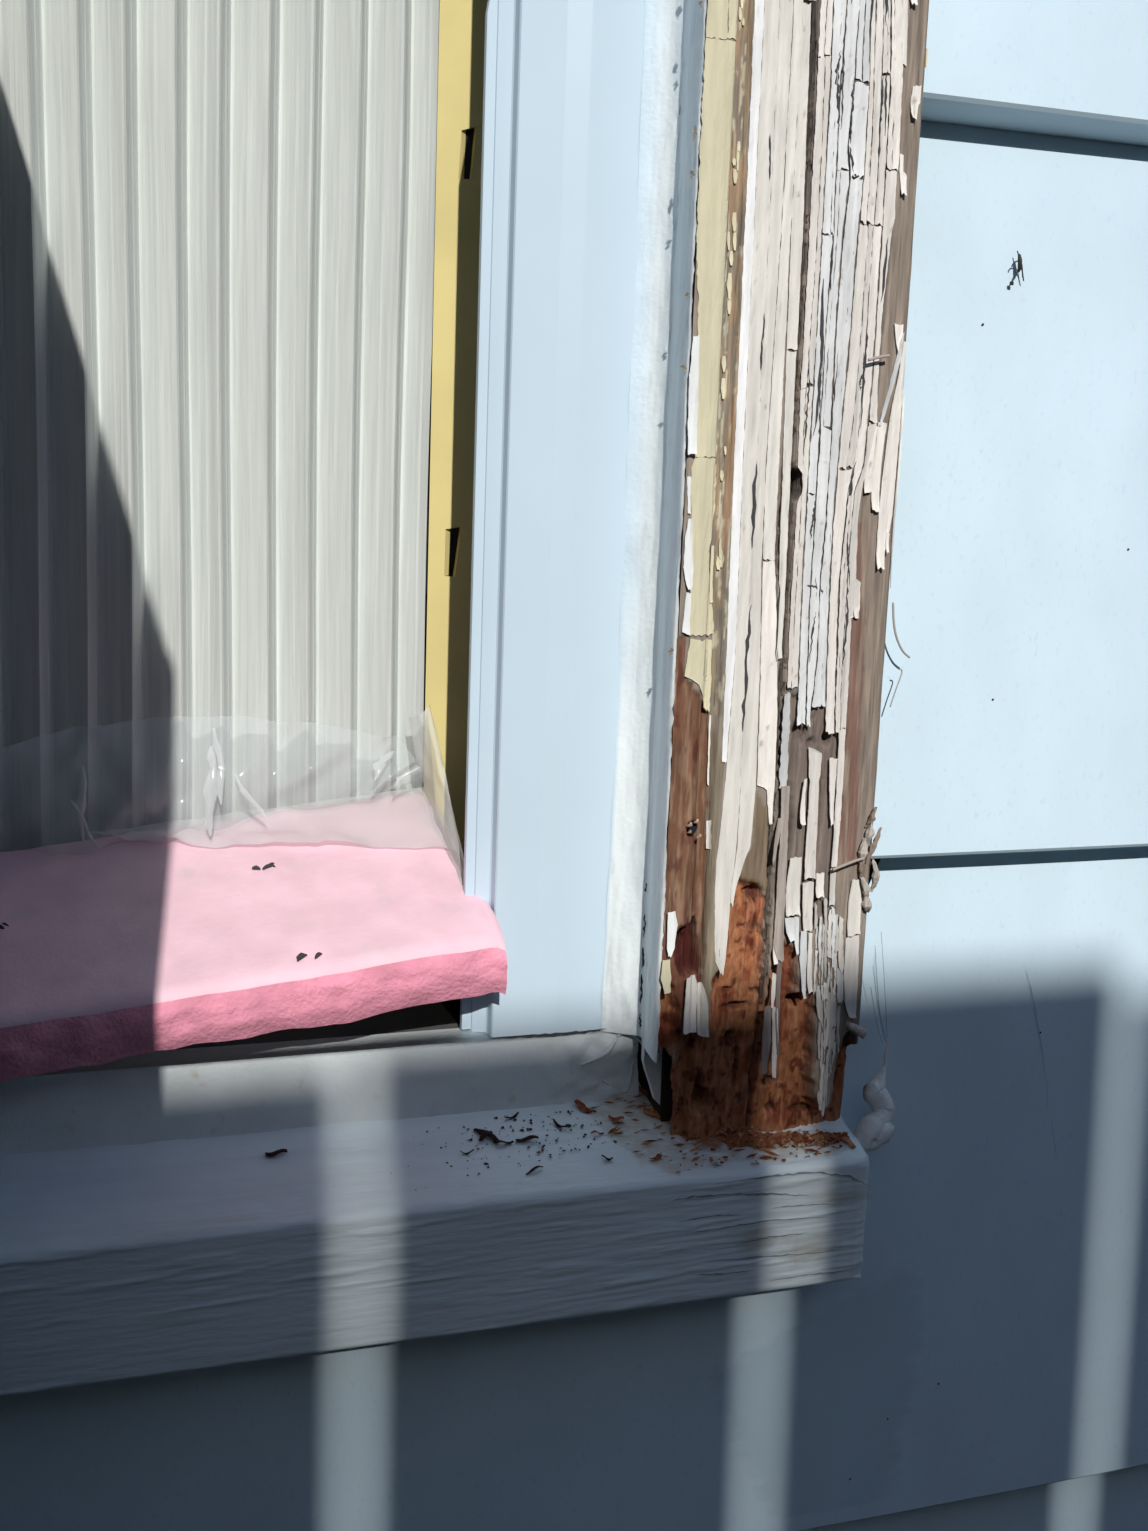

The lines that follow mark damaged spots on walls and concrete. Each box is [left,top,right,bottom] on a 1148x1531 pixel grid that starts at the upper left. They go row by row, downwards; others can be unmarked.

peeling [660,911,709,1037]
peeling [668,0,921,1117]